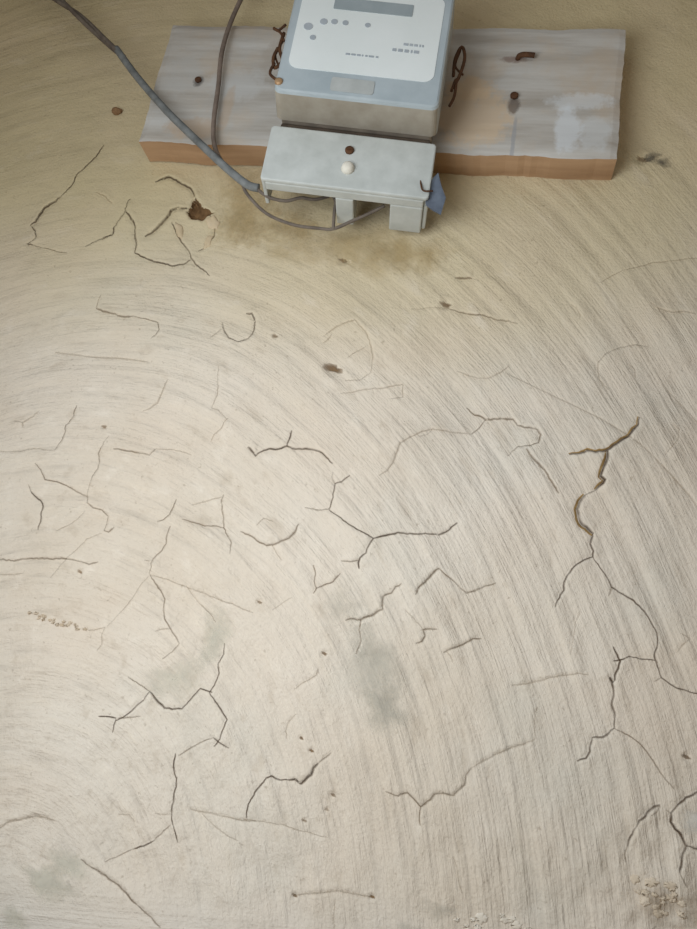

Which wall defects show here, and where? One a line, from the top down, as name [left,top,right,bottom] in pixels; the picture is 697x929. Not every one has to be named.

crack [27,148,102,253]
crack [89,177,207,273]
crack [249,430,455,568]
crack [468,409,697,764]
crack [99,654,227,849]
crack [246,758,324,818]
crack [624,792,697,885]